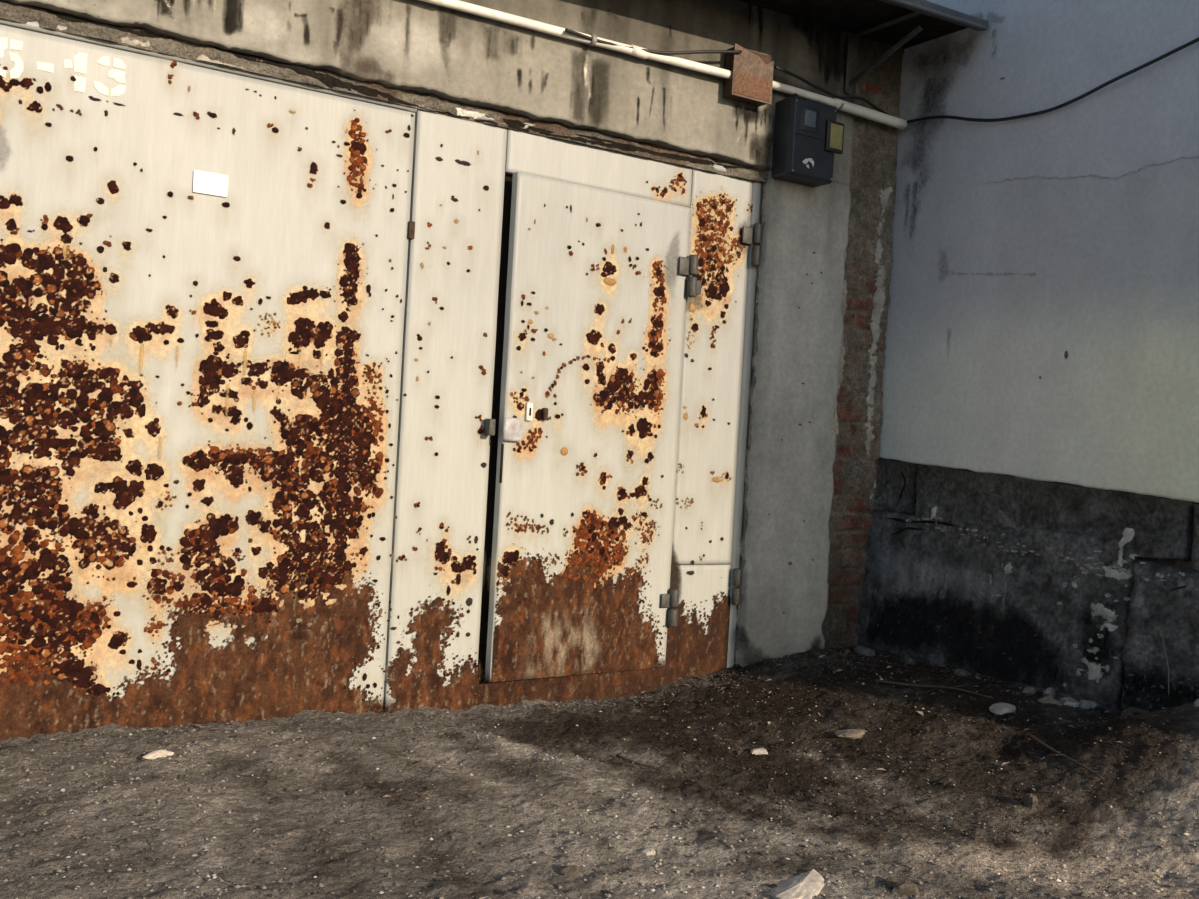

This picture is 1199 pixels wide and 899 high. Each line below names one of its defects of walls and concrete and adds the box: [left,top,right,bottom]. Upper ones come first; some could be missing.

leakage [209,0,241,34]
leakage [295,13,310,44]
leakage [337,0,391,80]
corrosion [0,66,82,127]
leakage [575,54,609,124]
leakage [637,67,666,123]
corrosion [307,162,318,188]
corrosion [332,109,409,212]
leakage [735,106,775,170]
crack [967,156,1199,186]
corrosion [646,172,753,362]
corrosion [0,180,731,740]